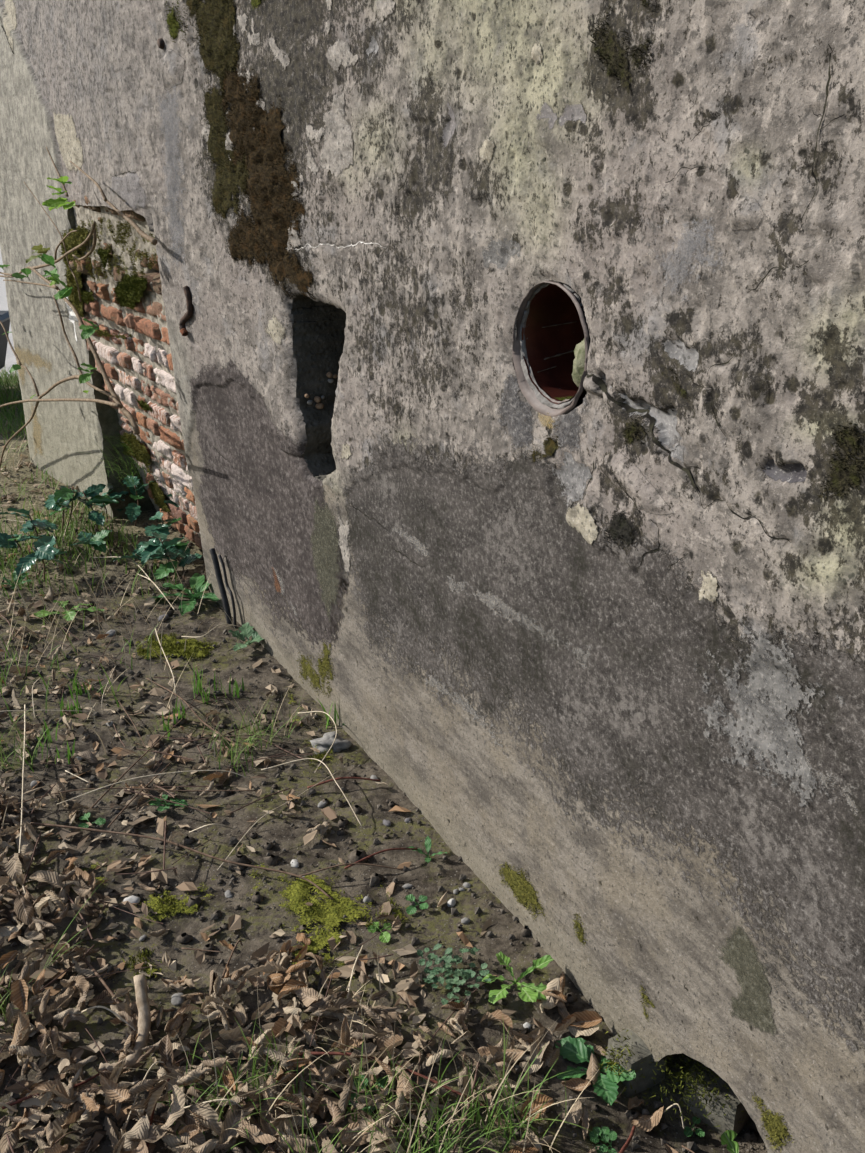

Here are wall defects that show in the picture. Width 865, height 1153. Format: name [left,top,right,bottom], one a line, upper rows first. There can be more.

crack [582,454,688,586]
crack [586,373,791,543]
crack [687,347,740,445]
damp [190,356,865,1075]